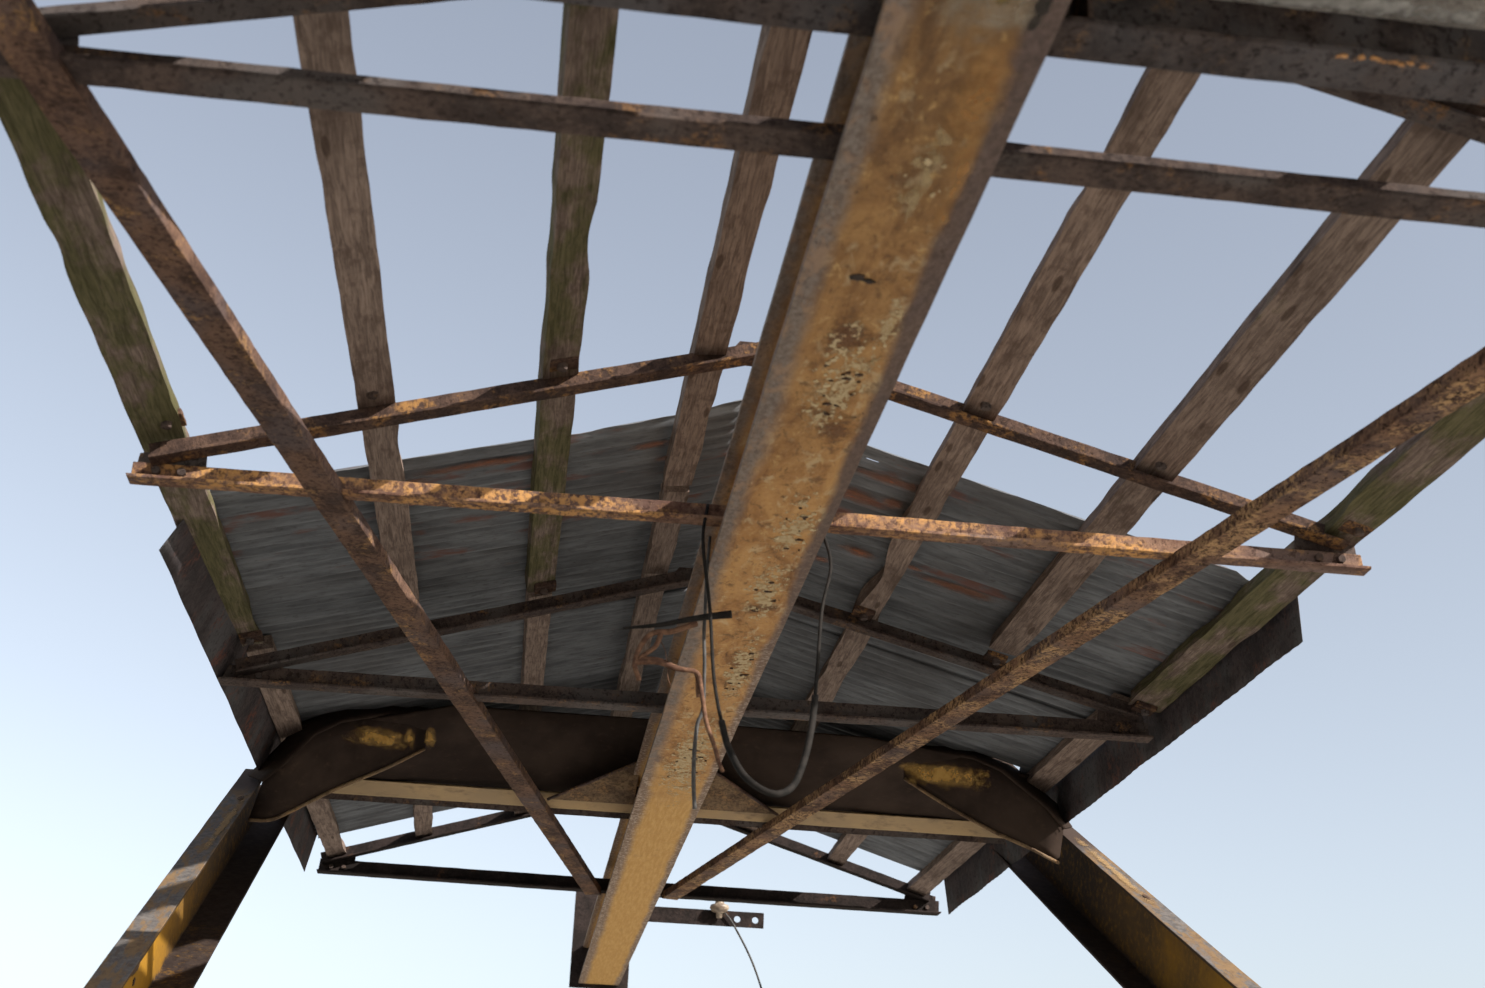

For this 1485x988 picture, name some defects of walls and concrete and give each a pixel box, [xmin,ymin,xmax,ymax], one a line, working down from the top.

corrosion [830,325,866,350]